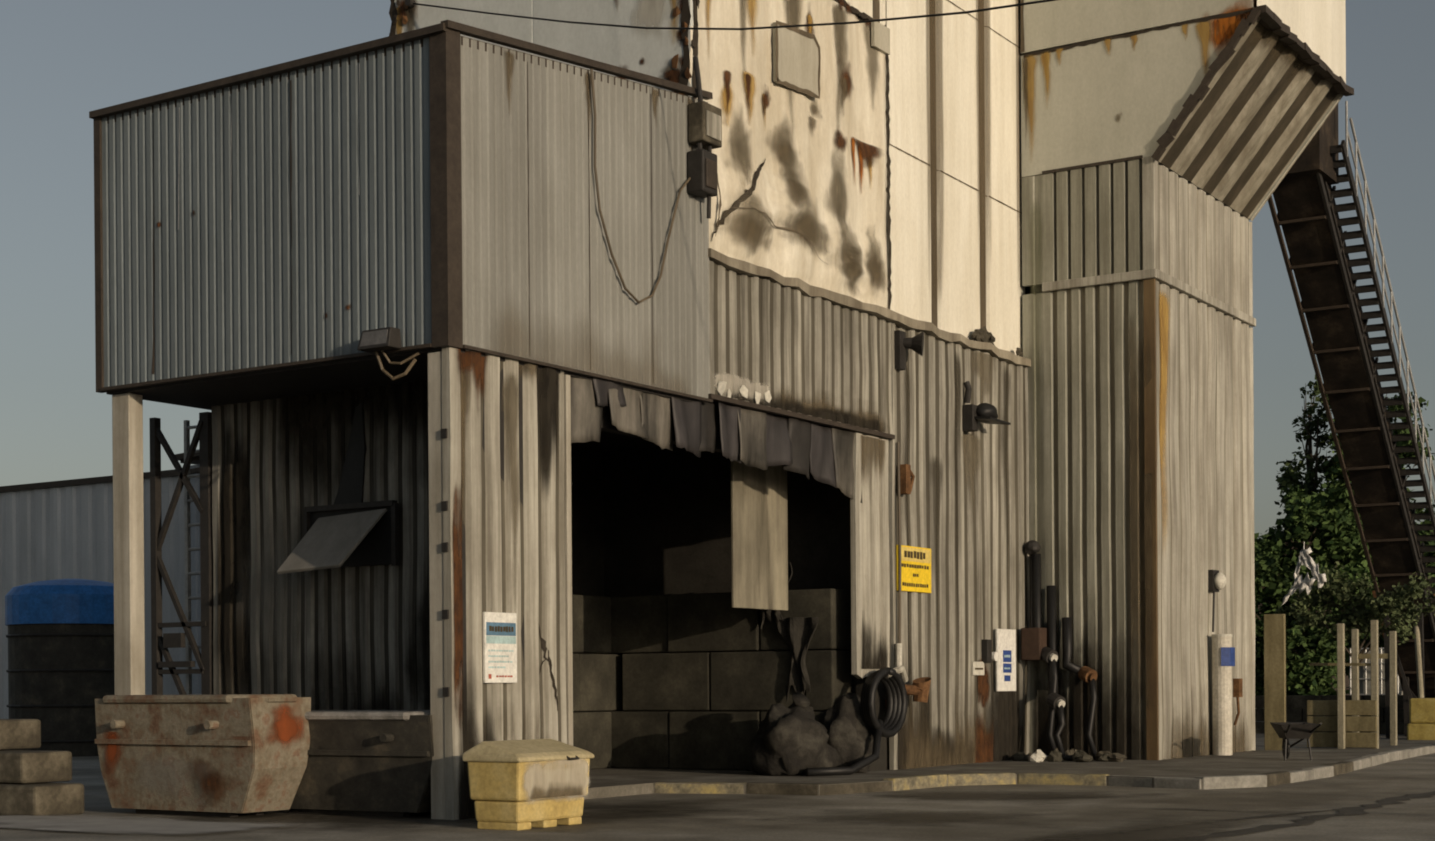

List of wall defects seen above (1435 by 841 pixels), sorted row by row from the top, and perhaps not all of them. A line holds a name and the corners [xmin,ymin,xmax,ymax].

rust [506,51,514,99]
rust [652,64,694,115]
rust [723,70,770,117]
rust [810,104,818,130]
rust [1023,6,1311,142]
damp [732,119,751,170]
rust [834,0,892,309]
damp [777,124,828,250]
damp [732,197,764,247]
damp [830,162,885,287]
peeling [715,374,772,404]
rust [1130,294,1169,704]